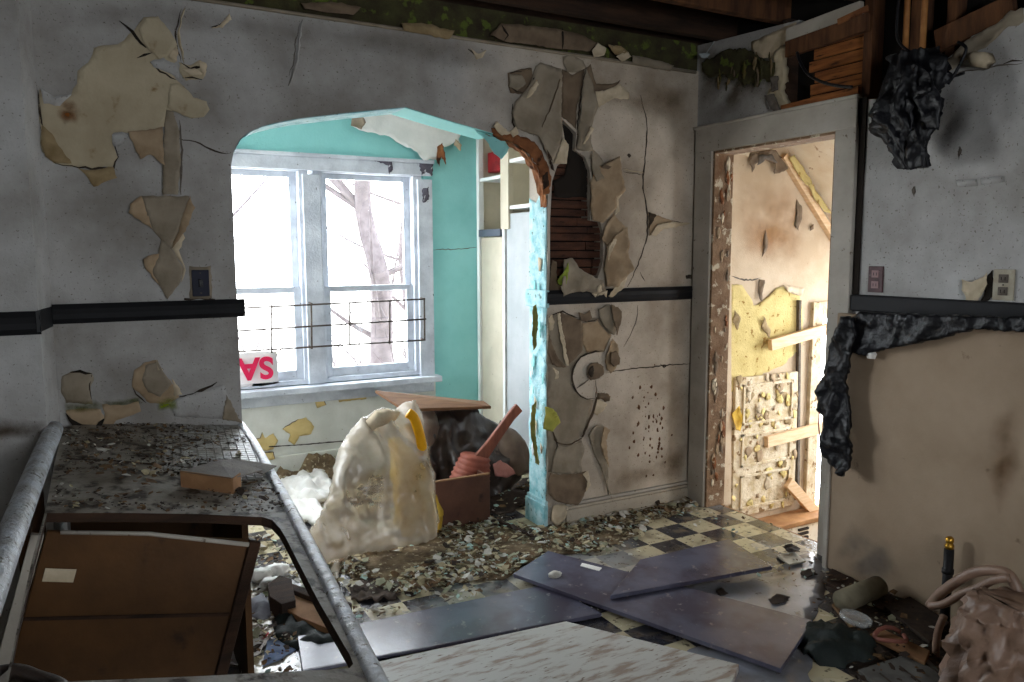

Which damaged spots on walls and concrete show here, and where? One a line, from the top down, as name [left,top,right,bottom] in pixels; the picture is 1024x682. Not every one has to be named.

spalling [702,0,1024,111]
peeling [38,16,212,299]
peeling [351,114,462,203]
peeling [475,130,509,159]
flaking render [491,23,674,290]
crack [608,98,691,373]
peeling [711,156,804,509]
peeling [961,271,993,301]
peeling [66,360,182,426]
peeling [256,417,314,460]
peeling [529,305,612,501]